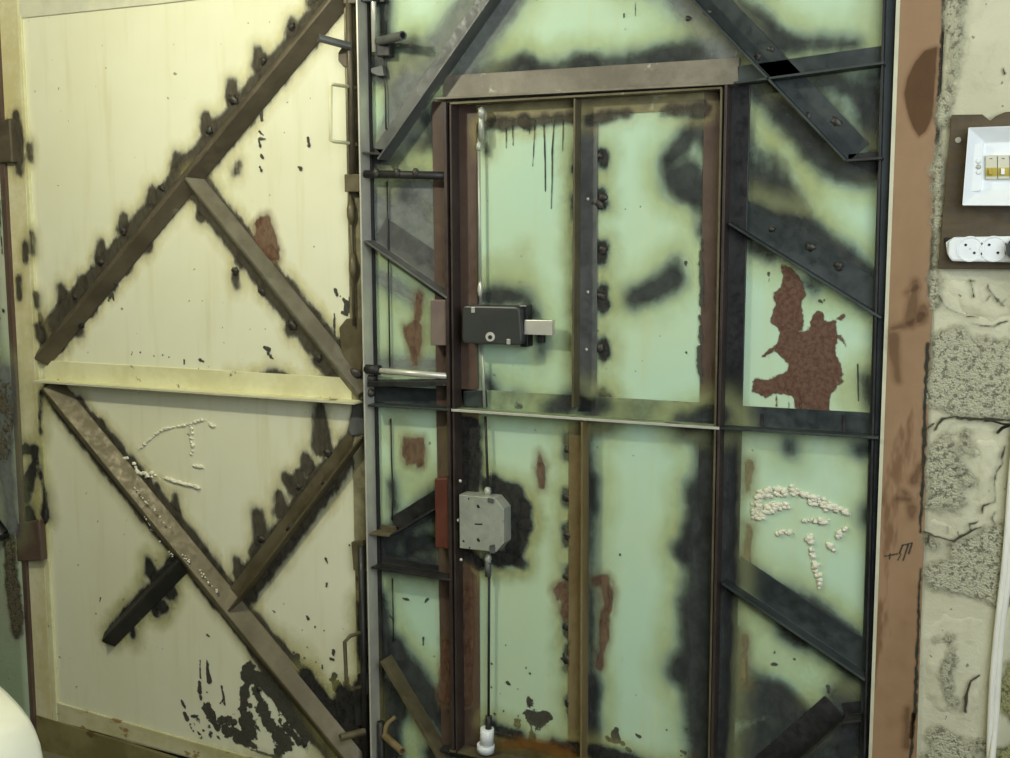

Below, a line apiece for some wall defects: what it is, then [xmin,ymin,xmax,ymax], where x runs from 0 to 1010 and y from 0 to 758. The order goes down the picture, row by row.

corrosion [254,215,280,260]
corrosion [403,292,422,365]
corrosion [752,265,845,410]
corrosion [402,437,425,468]
peeling [181,659,312,758]